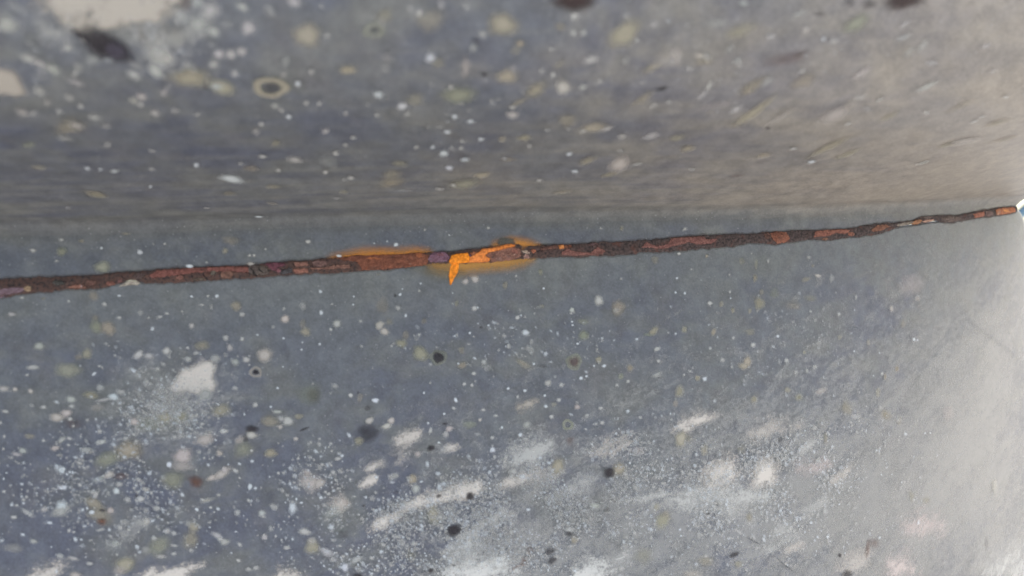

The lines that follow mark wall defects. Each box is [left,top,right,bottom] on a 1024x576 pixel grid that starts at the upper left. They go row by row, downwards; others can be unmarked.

corrosion [973,207,1016,218]
corrosion [871,216,961,232]
corrosion [642,236,717,249]
corrosion [764,231,790,244]
corrosion [133,240,606,285]
corrosion [0,286,31,298]